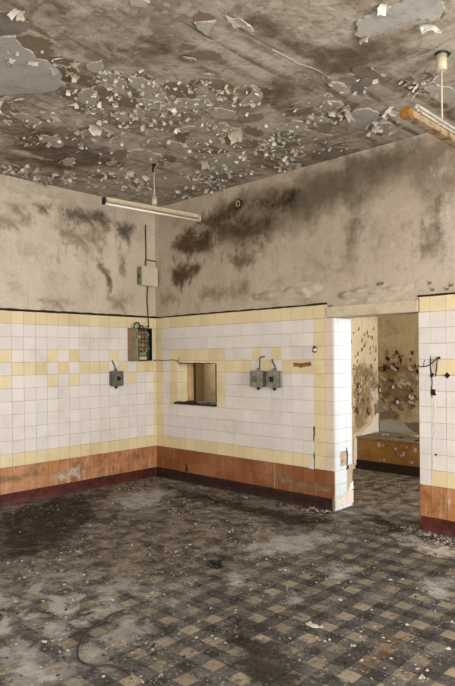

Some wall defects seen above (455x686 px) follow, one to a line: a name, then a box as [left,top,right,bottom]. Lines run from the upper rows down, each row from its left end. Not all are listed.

peeling [0,9,440,199]